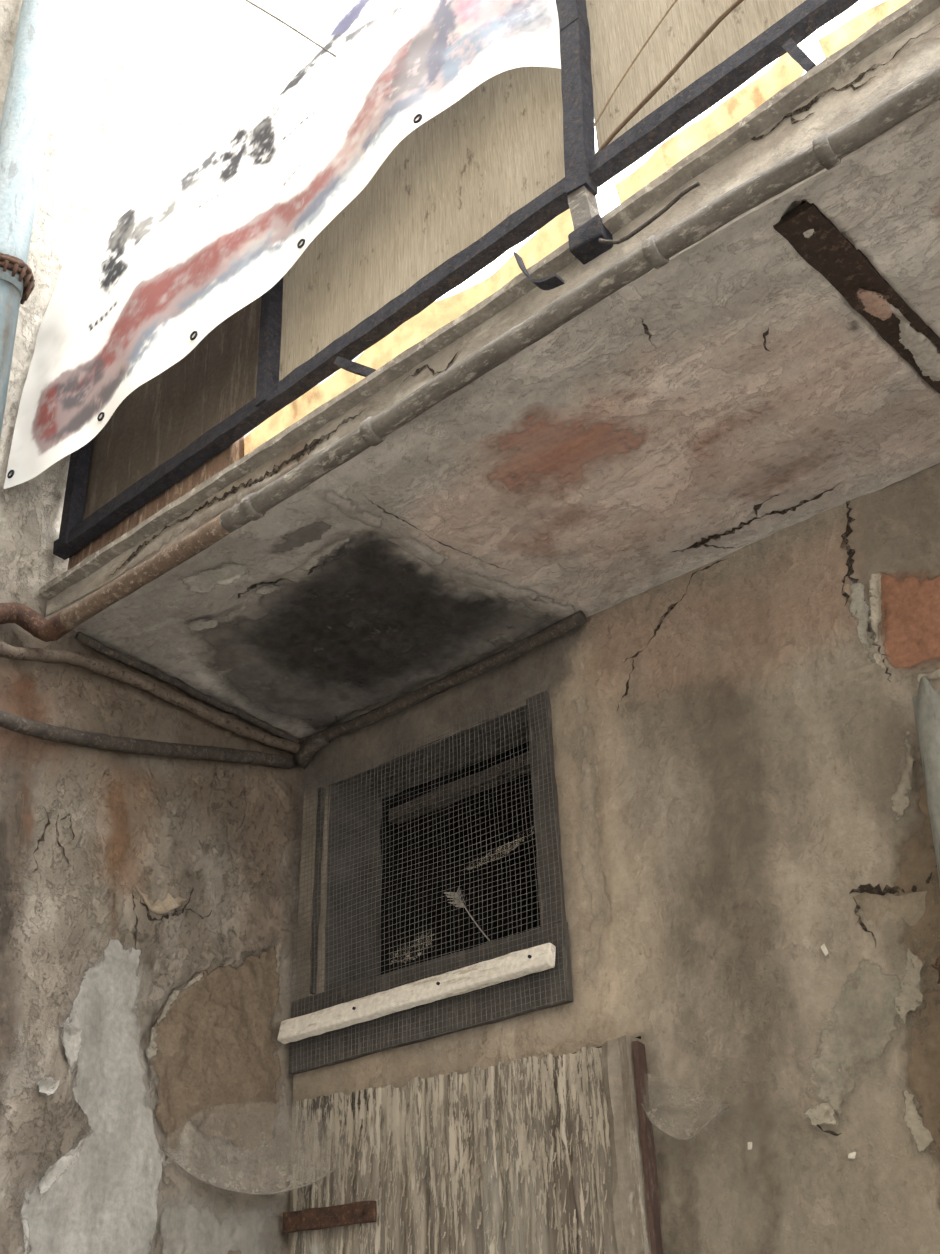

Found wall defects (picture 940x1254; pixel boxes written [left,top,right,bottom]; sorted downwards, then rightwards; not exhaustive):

water stain [184,533,552,729]
crack [617,479,891,711]
flaking render [869,572,940,683]
flaking render [805,730,940,1163]
peeling [21,939,281,1254]